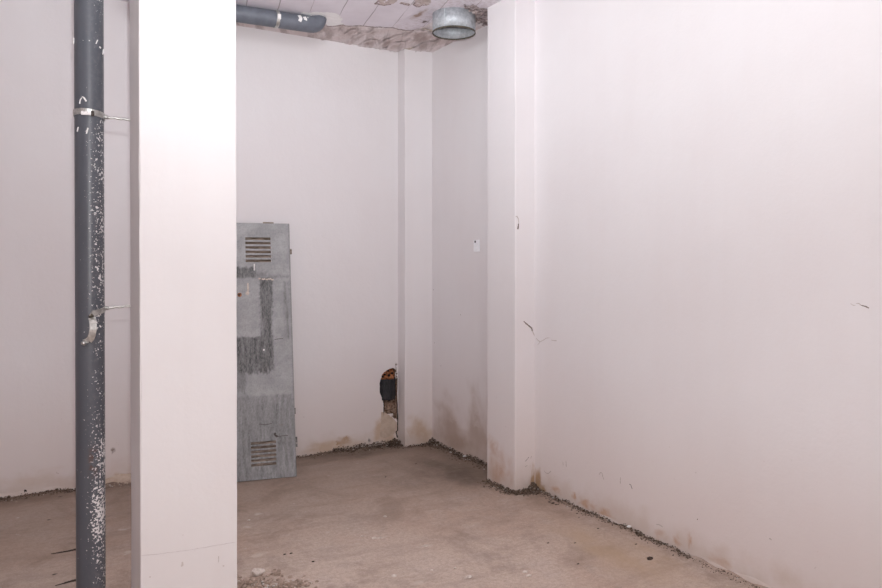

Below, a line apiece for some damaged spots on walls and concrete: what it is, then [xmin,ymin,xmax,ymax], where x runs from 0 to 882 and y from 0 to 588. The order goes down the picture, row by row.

spalling [464,4,488,26]
spalling [381,362,398,380]
spalling [380,396,398,438]
water stain [296,371,514,490]
water stain [505,505,742,588]